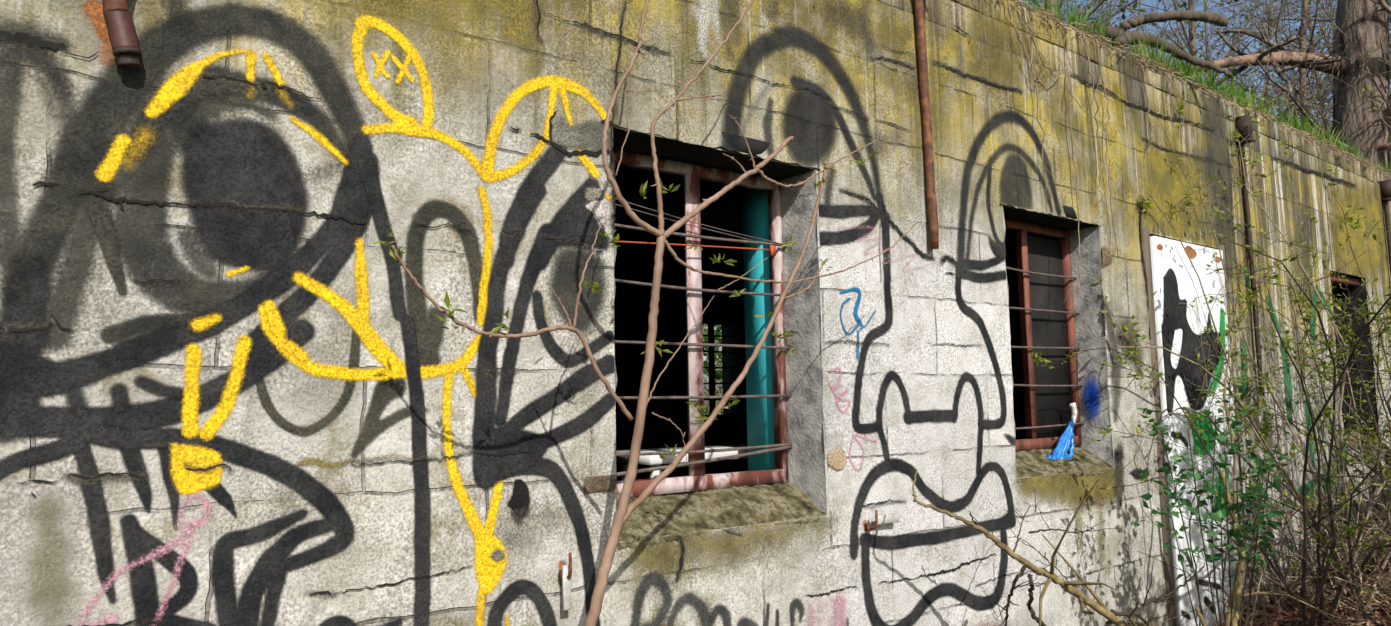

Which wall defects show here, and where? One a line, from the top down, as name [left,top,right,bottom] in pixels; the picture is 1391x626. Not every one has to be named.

rust [84,0,117,66]
damp [696,0,739,62]
crack [32,180,366,242]
damp [1157,91,1234,280]
damp [1104,301,1144,421]
damp [1075,442,1124,564]
crack [67,618,164,626]